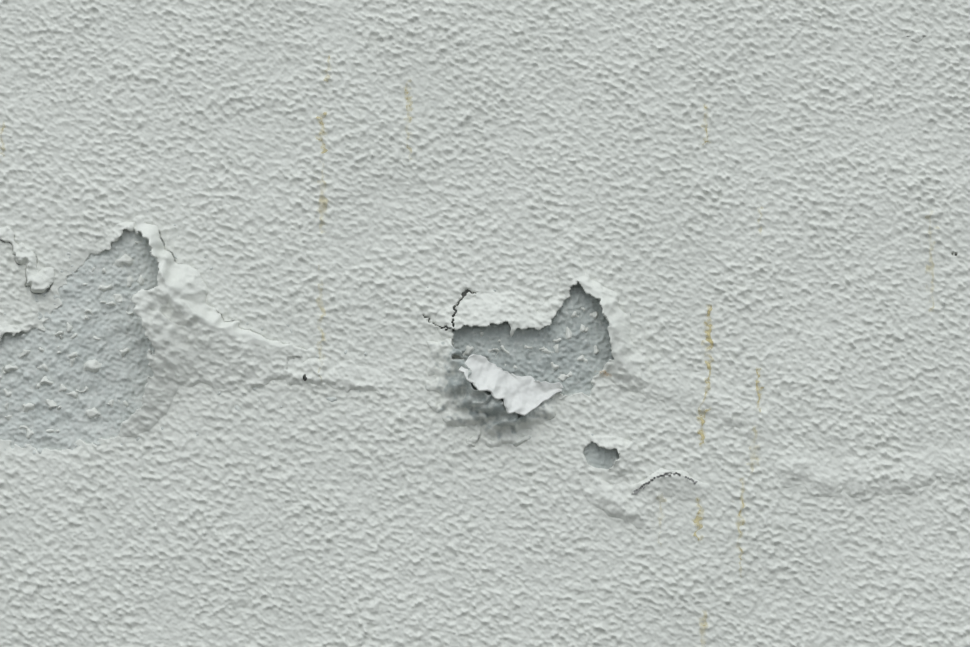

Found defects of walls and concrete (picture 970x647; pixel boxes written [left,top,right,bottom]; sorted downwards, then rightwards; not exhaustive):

peeling [0,211,321,454]
crack [423,289,476,331]
peeling [425,207,663,447]
peeling [583,434,639,482]
crack [632,472,697,495]